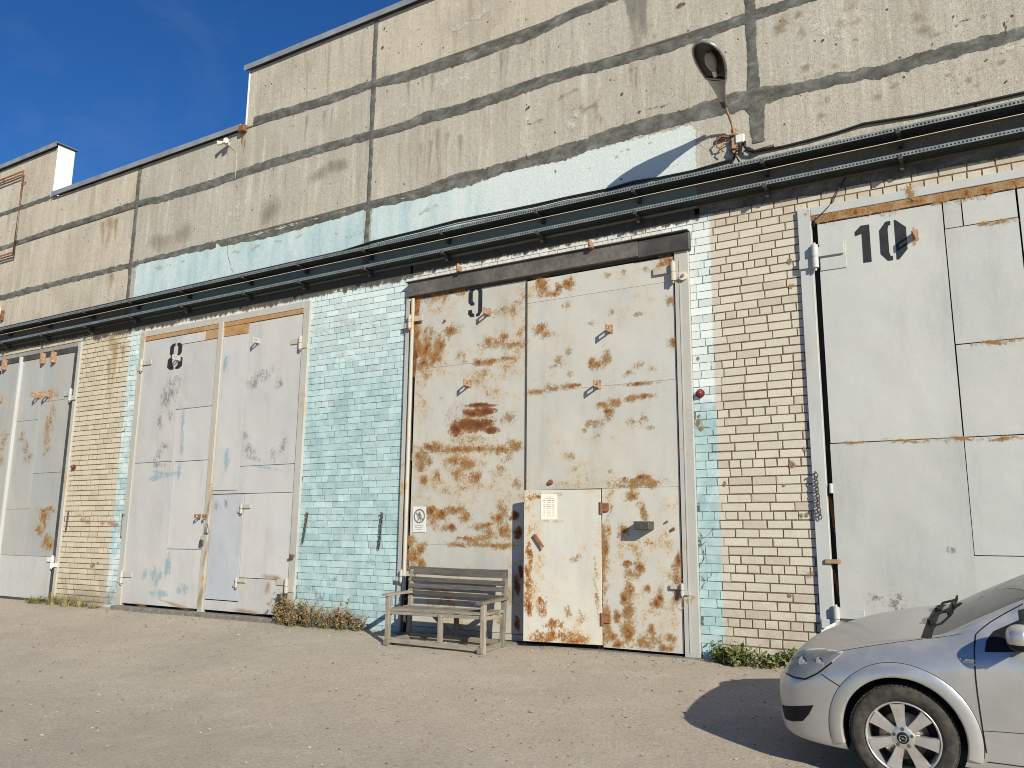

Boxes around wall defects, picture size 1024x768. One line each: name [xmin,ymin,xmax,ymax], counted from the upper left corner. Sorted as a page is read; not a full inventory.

rust [805,177,1024,223]
rust [534,272,576,307]
peeling [158,376,184,451]
rust [412,402,541,500]
rust [413,288,555,384]
rust [527,348,582,395]
rust [588,350,612,370]
rust [584,362,661,437]
peeling [143,551,189,597]
rust [406,533,428,570]
rust [425,499,589,644]
rust [593,470,695,652]